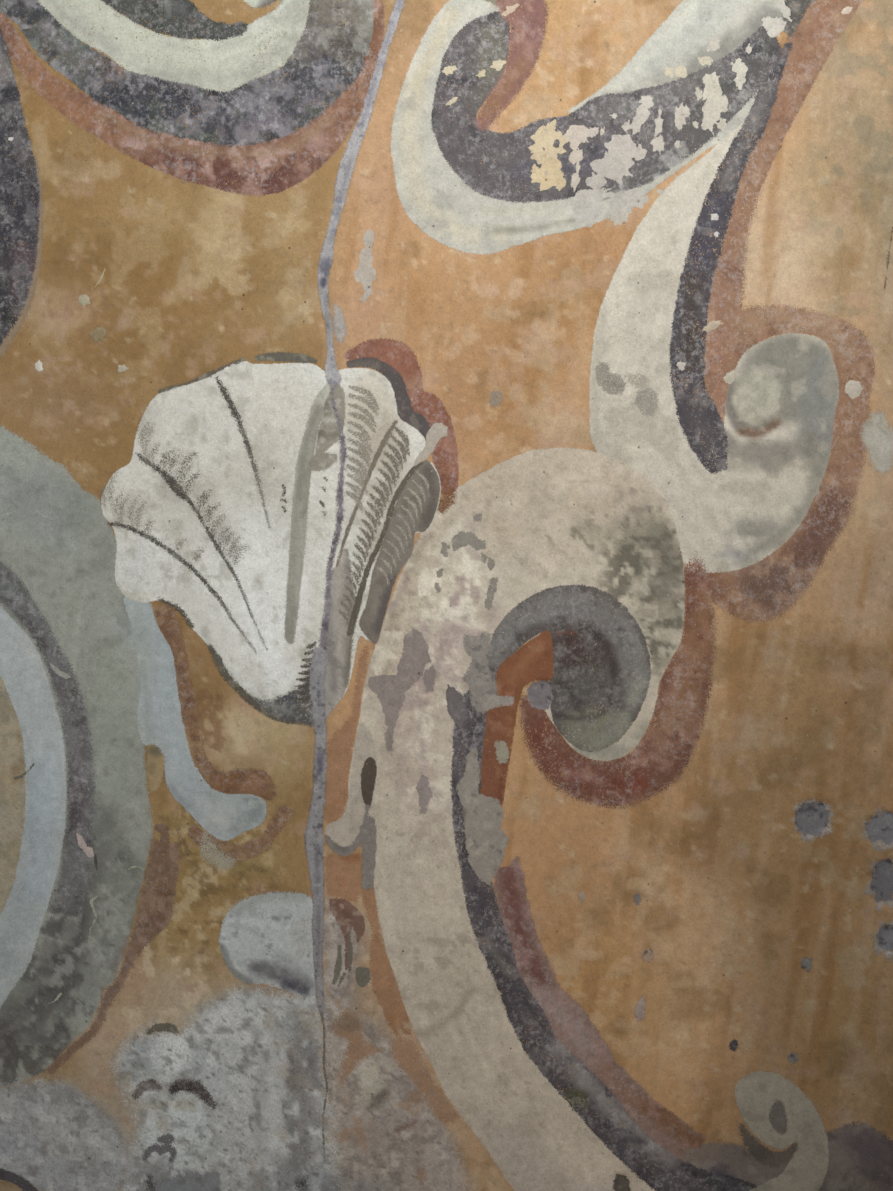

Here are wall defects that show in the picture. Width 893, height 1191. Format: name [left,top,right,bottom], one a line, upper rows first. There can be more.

peeling [485,0,519,16]
peeling [761,1,792,38]
peeling [475,59,507,78]
peeling [528,33,752,227]
crack [304,0,404,1161]